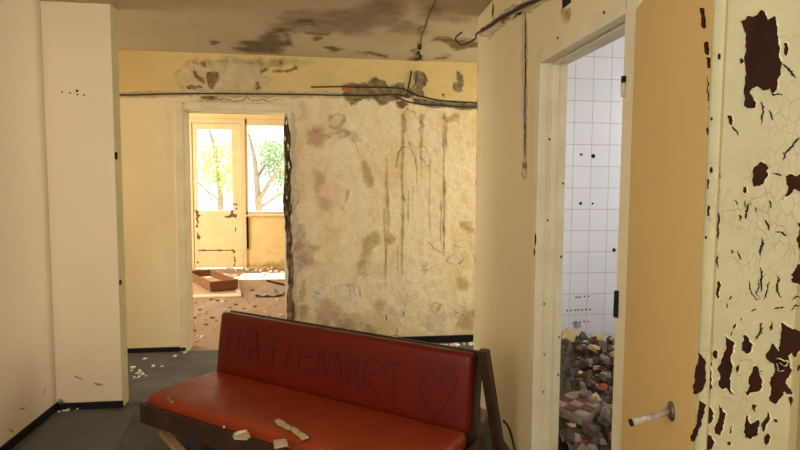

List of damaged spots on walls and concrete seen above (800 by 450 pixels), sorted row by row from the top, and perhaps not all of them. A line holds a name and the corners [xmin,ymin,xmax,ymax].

water stain [236,29,297,73]
peeling [119,42,478,111]
water stain [434,38,478,51]
spalling [704,41,721,68]
peeling [739,9,790,110]
crack [761,93,782,125]
crack [773,138,800,176]
peeling [742,161,770,195]
peeling [782,172,800,200]
flaking render [283,113,299,320]
peeling [690,317,800,450]